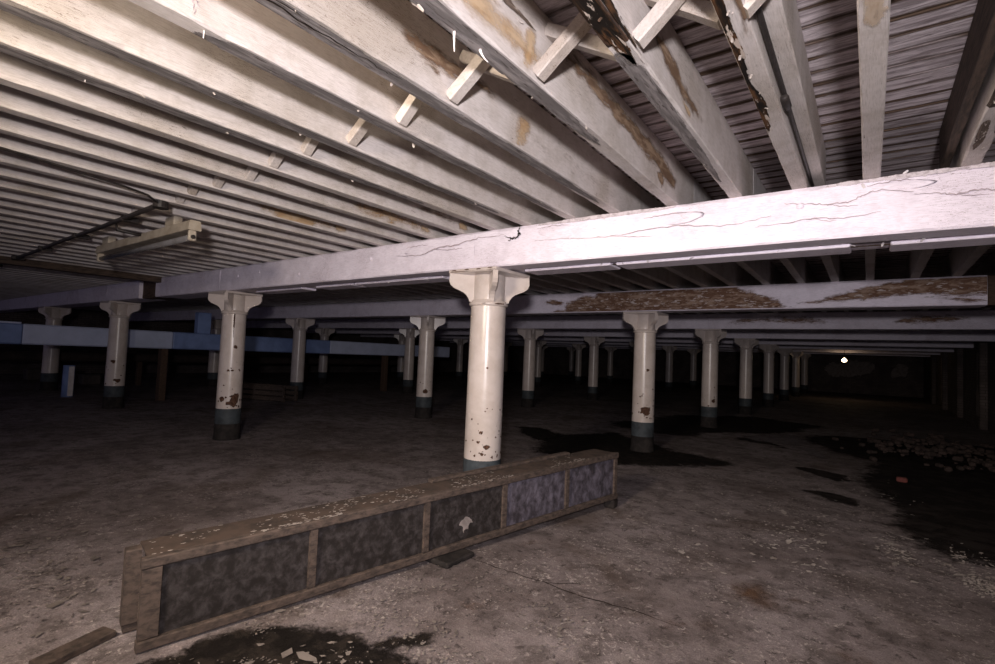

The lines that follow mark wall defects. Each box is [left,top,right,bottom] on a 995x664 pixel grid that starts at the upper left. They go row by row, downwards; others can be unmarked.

crack [268,0,388,74]
damp [404,29,465,79]
damp [465,0,537,64]
peeling [193,0,676,226]
damp [565,54,676,188]
peeling [973,120,995,150]
peeling [827,162,995,189]
crack [408,188,995,256]
damp [515,421,735,467]
damp [654,415,995,567]
damp [136,625,432,664]